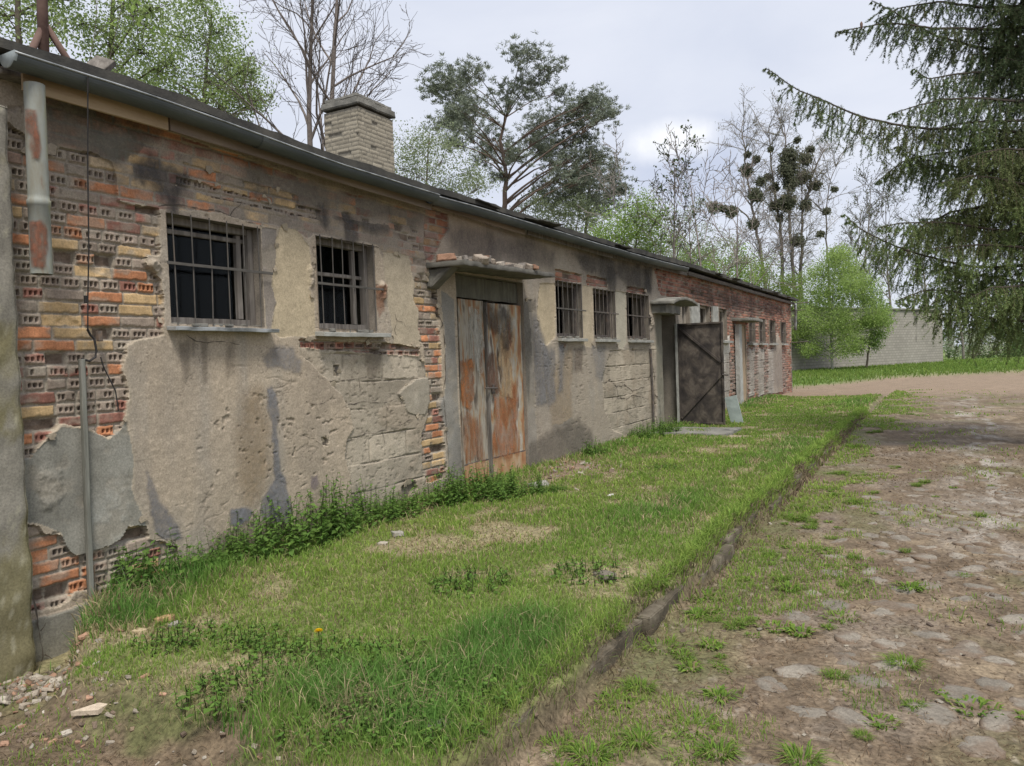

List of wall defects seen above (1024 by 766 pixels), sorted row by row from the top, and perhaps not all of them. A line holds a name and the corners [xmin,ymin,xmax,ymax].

corrosion [25,110,40,158]
flaking render [7,97,539,482]
leakage [212,388,330,557]
corrosion [460,359,520,459]
leakage [524,301,603,467]
flaking render [27,515,179,611]